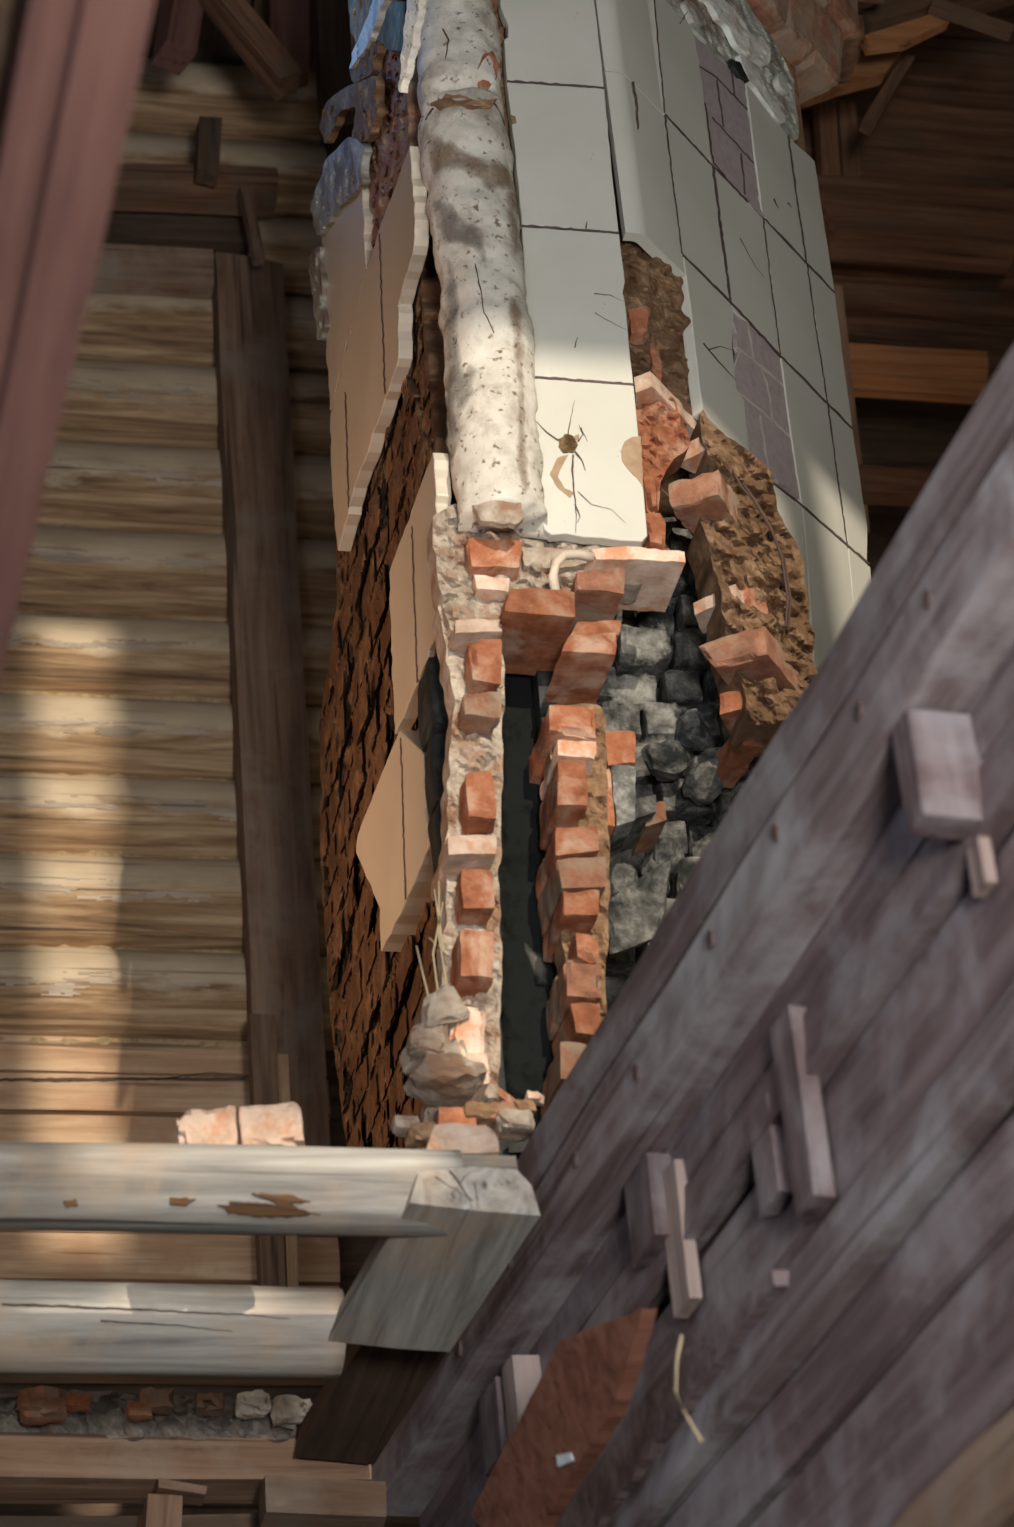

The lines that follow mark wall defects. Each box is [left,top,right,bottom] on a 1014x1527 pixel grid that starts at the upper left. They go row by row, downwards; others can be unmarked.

peeling [308,0,505,341]
spalling [472,500,524,529]
crack [536,401,612,533]
spalling [732,314,799,499]